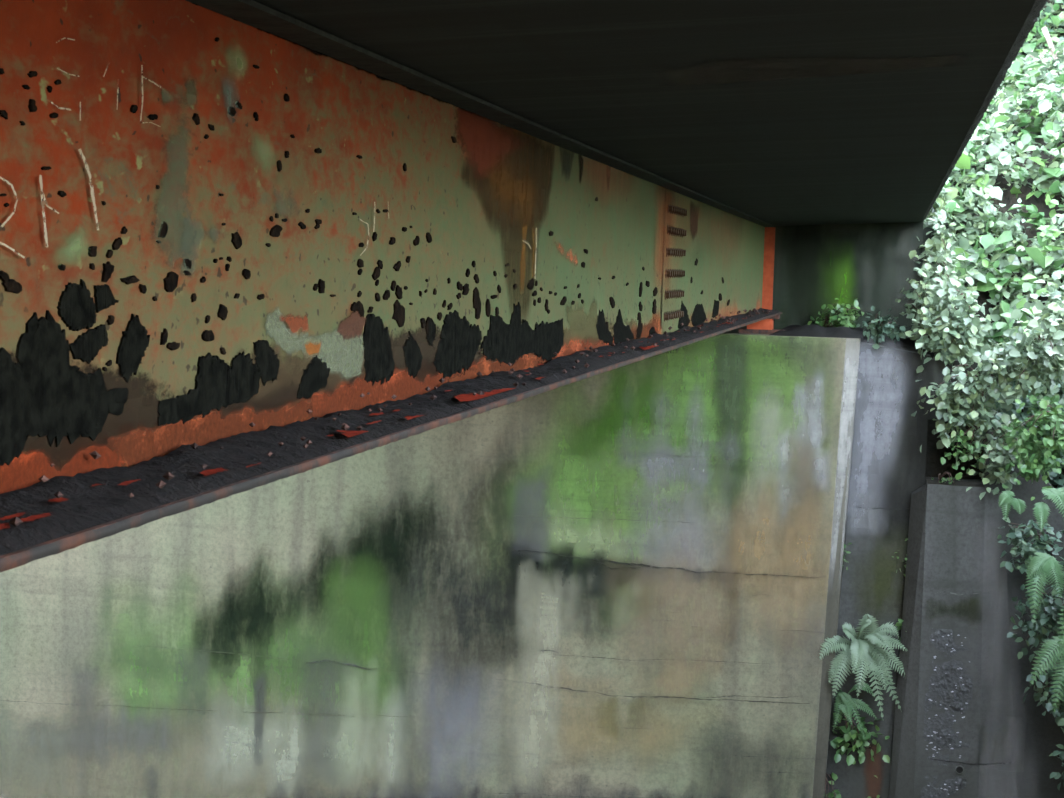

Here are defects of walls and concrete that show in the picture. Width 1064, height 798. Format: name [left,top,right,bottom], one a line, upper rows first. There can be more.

corrosion [0,28,658,468]
peeling [0,497,67,529]
peeling [0,309,625,494]
damp [716,338,746,585]
damp [26,680,478,798]
damp [419,466,651,775]
spalling [920,628,973,798]